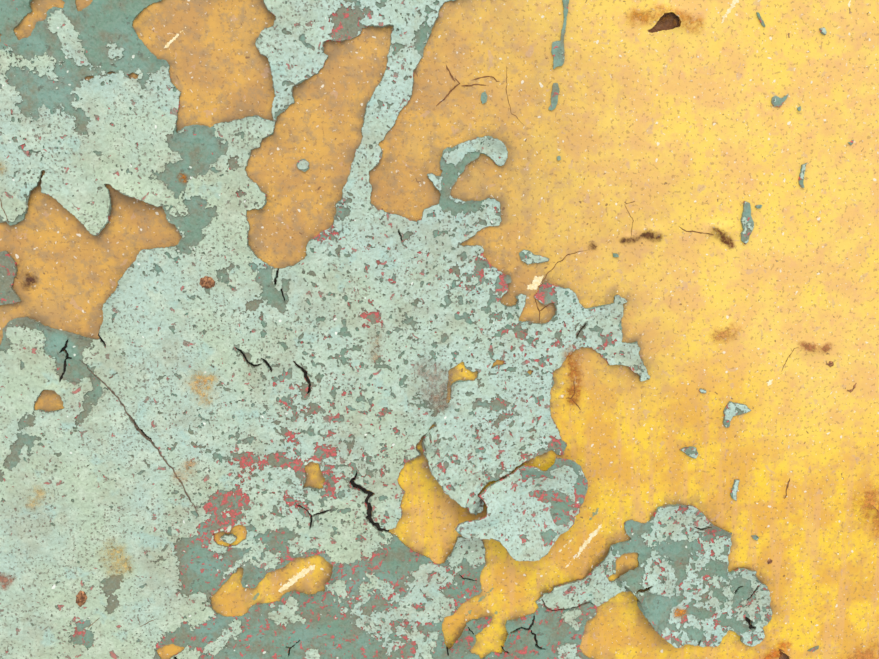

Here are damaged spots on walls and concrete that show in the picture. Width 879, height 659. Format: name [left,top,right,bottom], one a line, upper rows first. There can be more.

peeling [551,0,569,69]
rust [631,3,701,40]
peeling [548,83,560,111]
peeling [771,94,788,107]
peeling [427,136,508,219]
peeling [0,0,393,482]
peeling [519,249,549,265]
peeling [740,201,762,244]
peeling [605,357,650,382]
crack [60,339,199,517]
peeling [154,362,772,659]
rust [764,636,802,659]